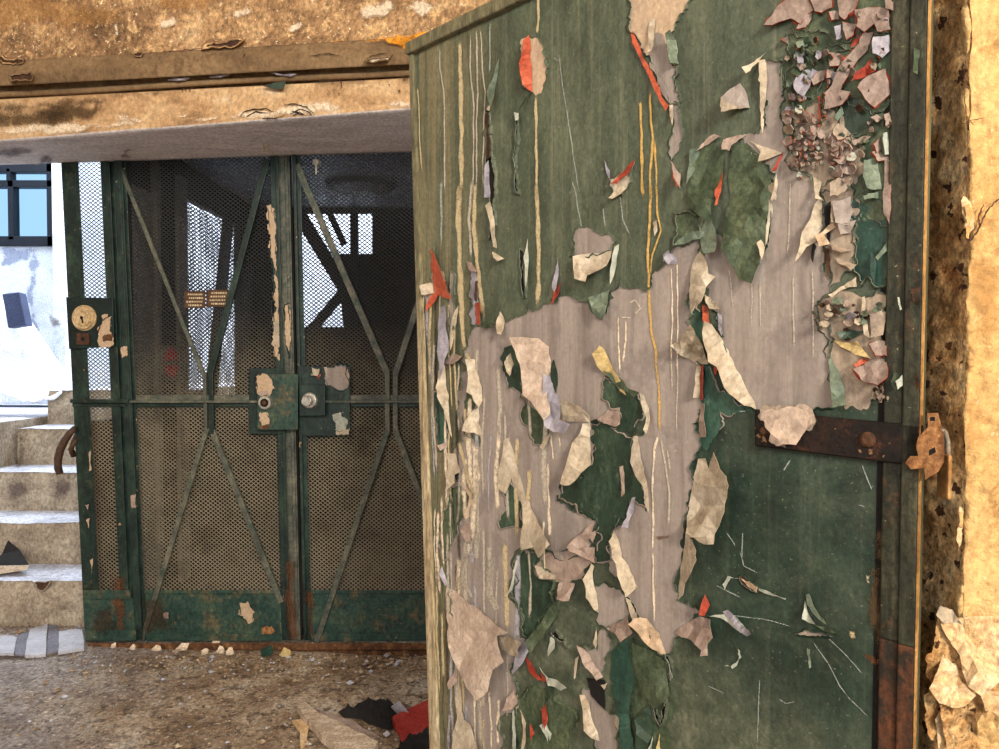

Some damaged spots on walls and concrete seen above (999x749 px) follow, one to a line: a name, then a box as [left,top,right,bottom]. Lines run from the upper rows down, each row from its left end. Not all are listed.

flaking render [201,37,245,50]
flaking render [0,53,34,82]
flaking render [364,54,393,63]
peeling [265,81,286,89]
peeling [255,372,274,398]
peeling [310,362,351,392]
peeling [419,0,903,749]
peeling [259,412,270,429]
peeling [332,412,350,435]
peeling [238,601,291,657]
peeling [924,606,999,749]